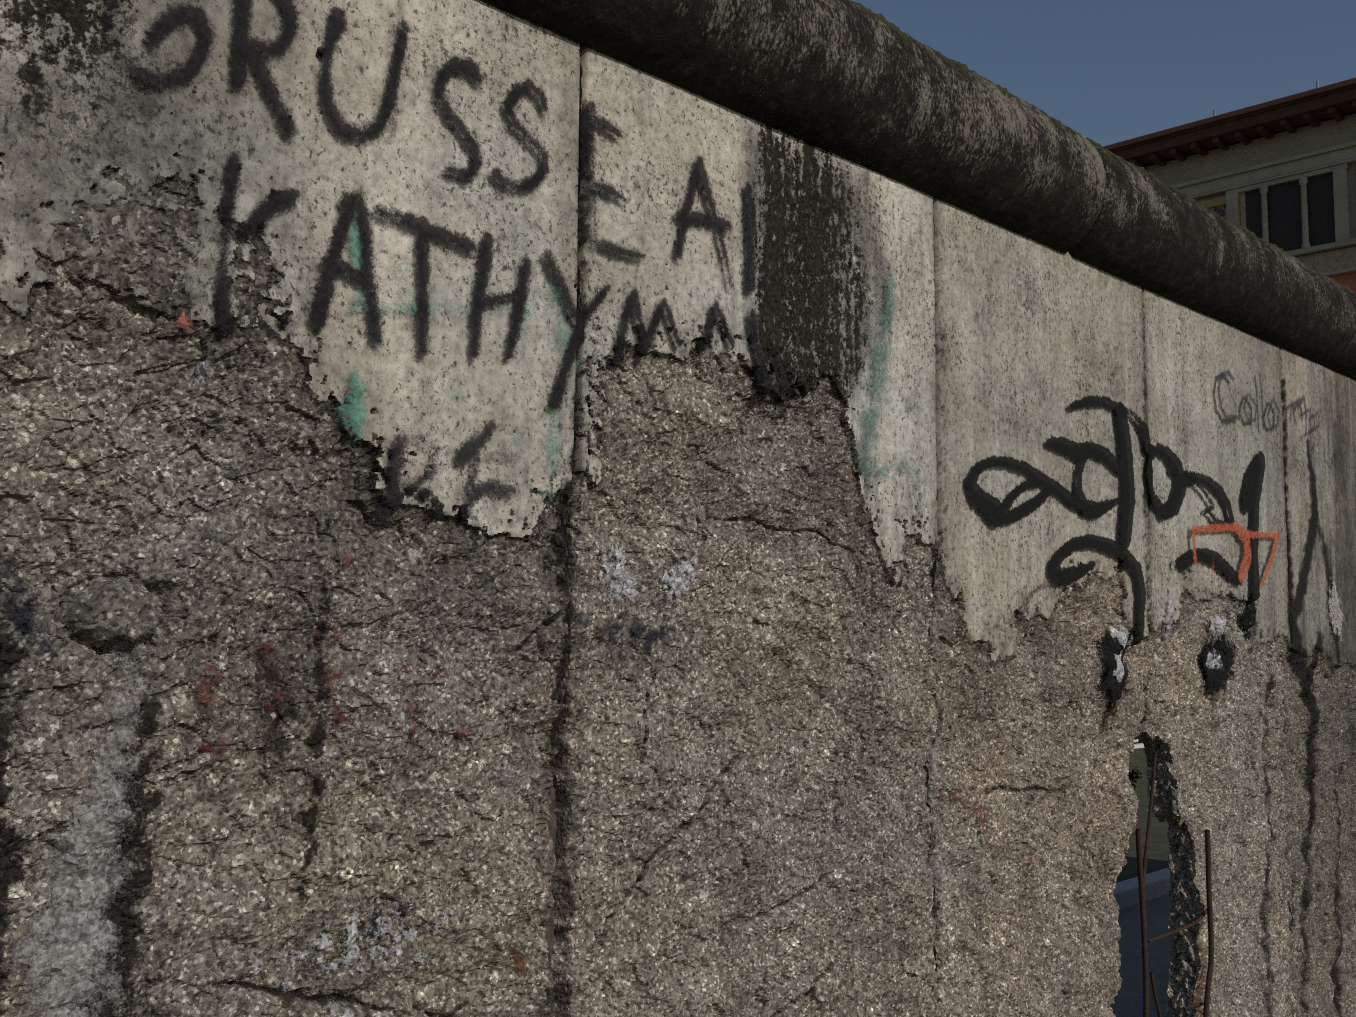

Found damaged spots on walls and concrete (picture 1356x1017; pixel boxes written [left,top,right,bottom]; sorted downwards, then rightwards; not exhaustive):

water stain [0,0,138,127]
water stain [576,144,591,307]
water stain [749,124,885,427]
spalling [0,164,1202,1017]
water stain [544,331,716,768]
water stain [1142,447,1152,632]
spalling [1140,586,1356,1017]